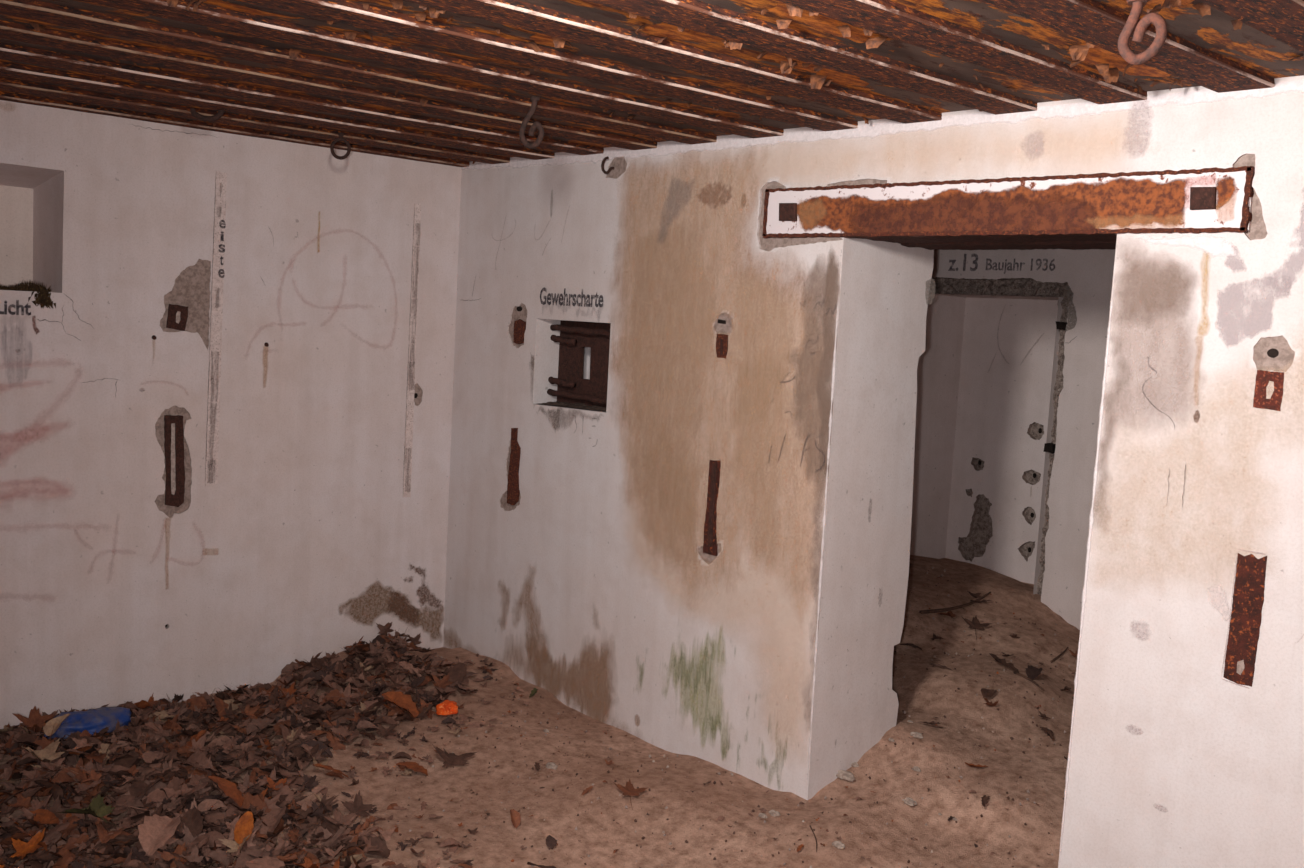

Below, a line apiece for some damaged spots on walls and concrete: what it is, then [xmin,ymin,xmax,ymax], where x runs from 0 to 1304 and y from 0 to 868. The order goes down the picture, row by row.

corrosion [629,13,743,50]
corrosion [761,2,888,49]
corrosion [1143,0,1211,17]
corrosion [756,51,883,89]
corrosion [1068,42,1183,93]
flaking render [1232,154,1255,168]
corrosion [797,177,1236,236]
flaking render [1244,188,1268,240]
flaking render [160,259,218,350]
leakage [617,165,837,590]
flaking render [155,406,192,518]
spalling [958,489,993,562]